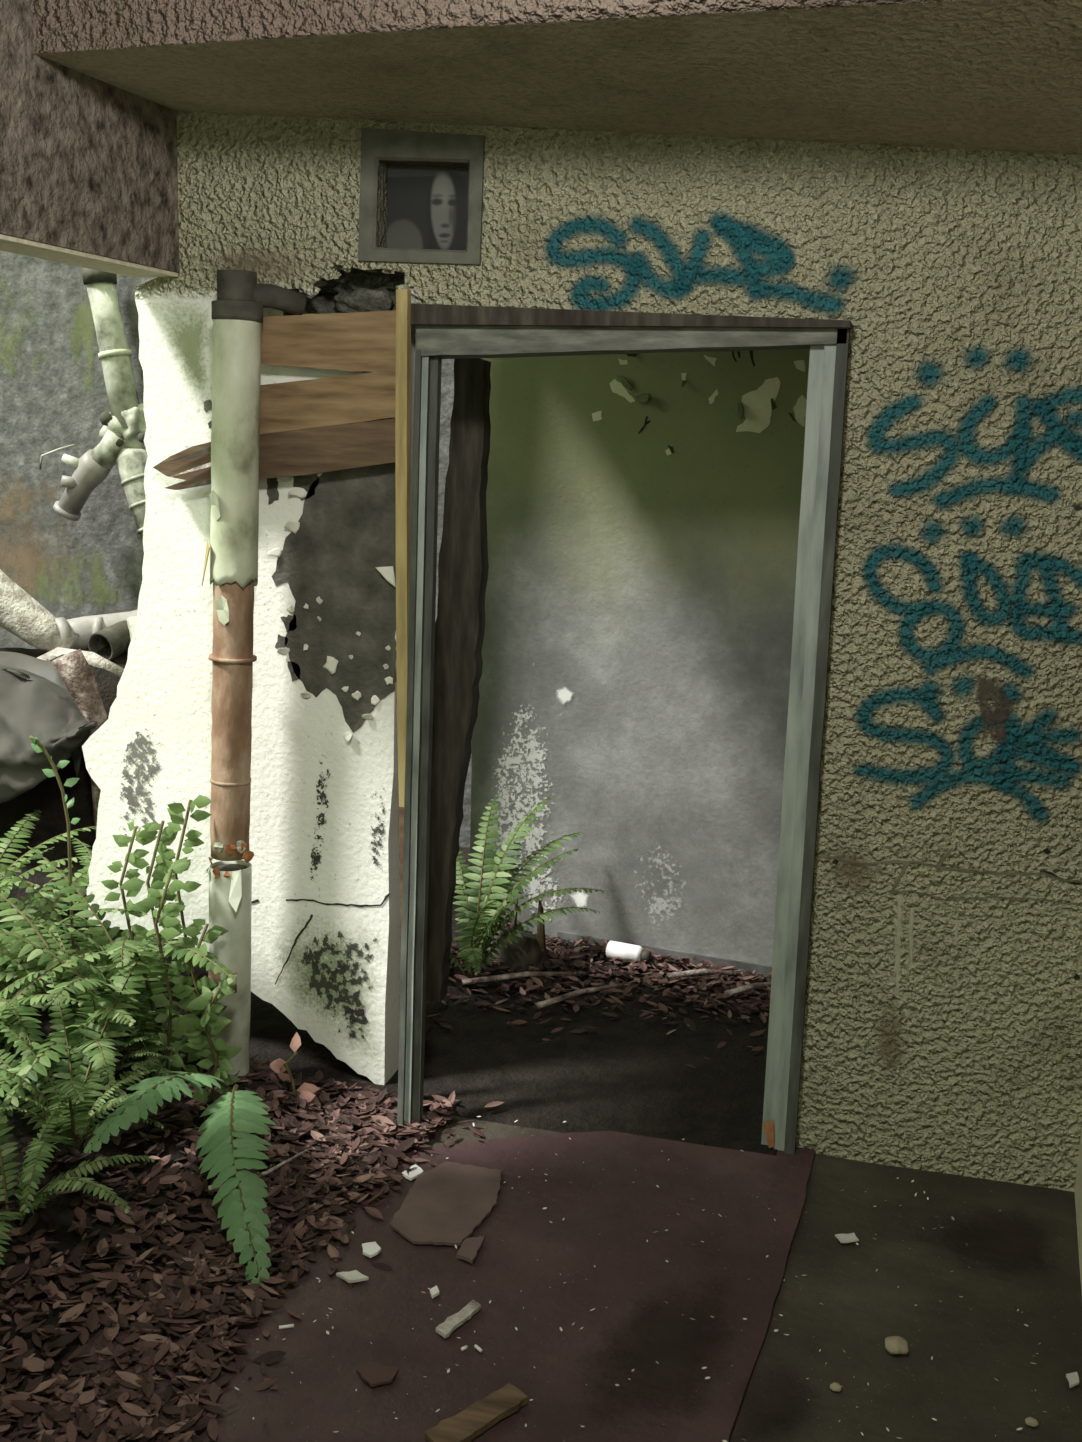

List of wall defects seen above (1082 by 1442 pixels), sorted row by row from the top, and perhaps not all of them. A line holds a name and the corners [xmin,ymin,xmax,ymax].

flaking render [283,263,412,316]
peeling [610,354,650,404]
peeling [736,377,807,433]
peeling [267,463,396,742]
corrosion [210,580,254,861]
damp [487,705,568,921]
crack [818,848,1082,905]
crack [252,893,390,985]
damp [288,931,377,1039]